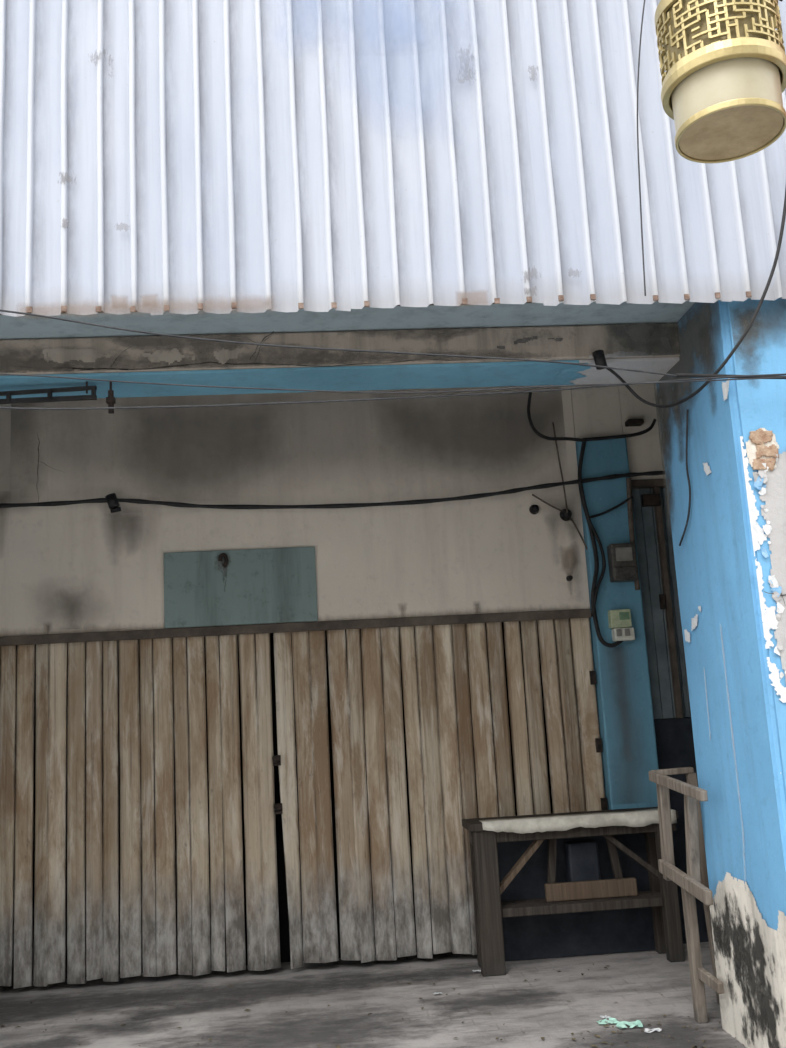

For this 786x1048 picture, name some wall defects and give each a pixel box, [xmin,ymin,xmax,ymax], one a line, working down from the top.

water stain [0,334,469,371]
water stain [396,328,473,338]
flaking render [740,428,786,703]
water stain [711,894,782,1048]
flaking render [709,872,786,1048]